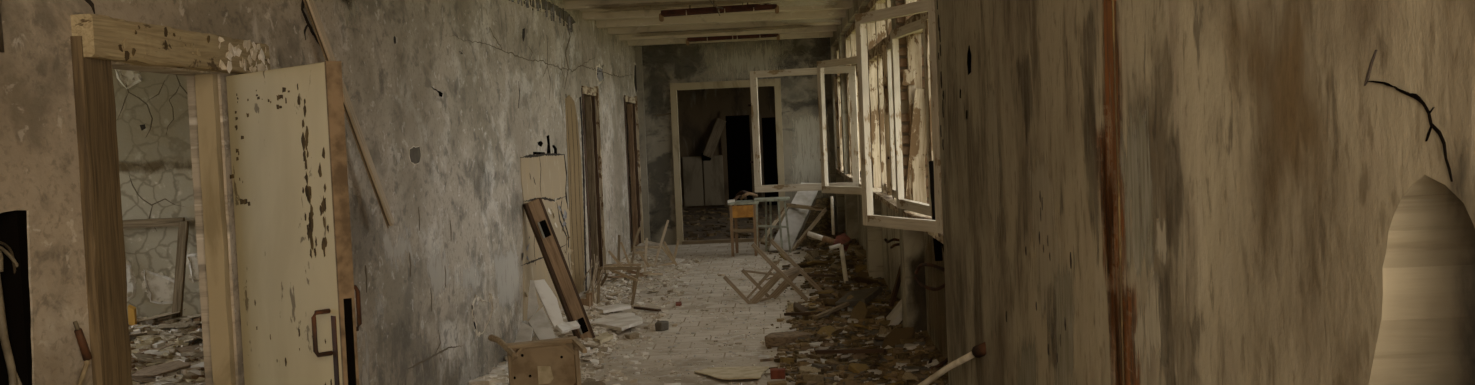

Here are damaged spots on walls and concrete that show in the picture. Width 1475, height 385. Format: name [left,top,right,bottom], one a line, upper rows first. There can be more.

crack [1364,50,1453,182]